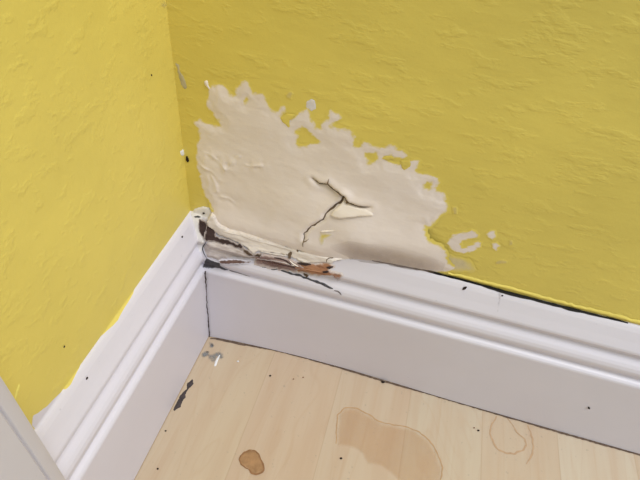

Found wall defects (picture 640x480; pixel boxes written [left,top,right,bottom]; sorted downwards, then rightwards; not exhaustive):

peeling [191,78,501,274]
crack [263,178,370,295]
leakage [239,449,265,475]